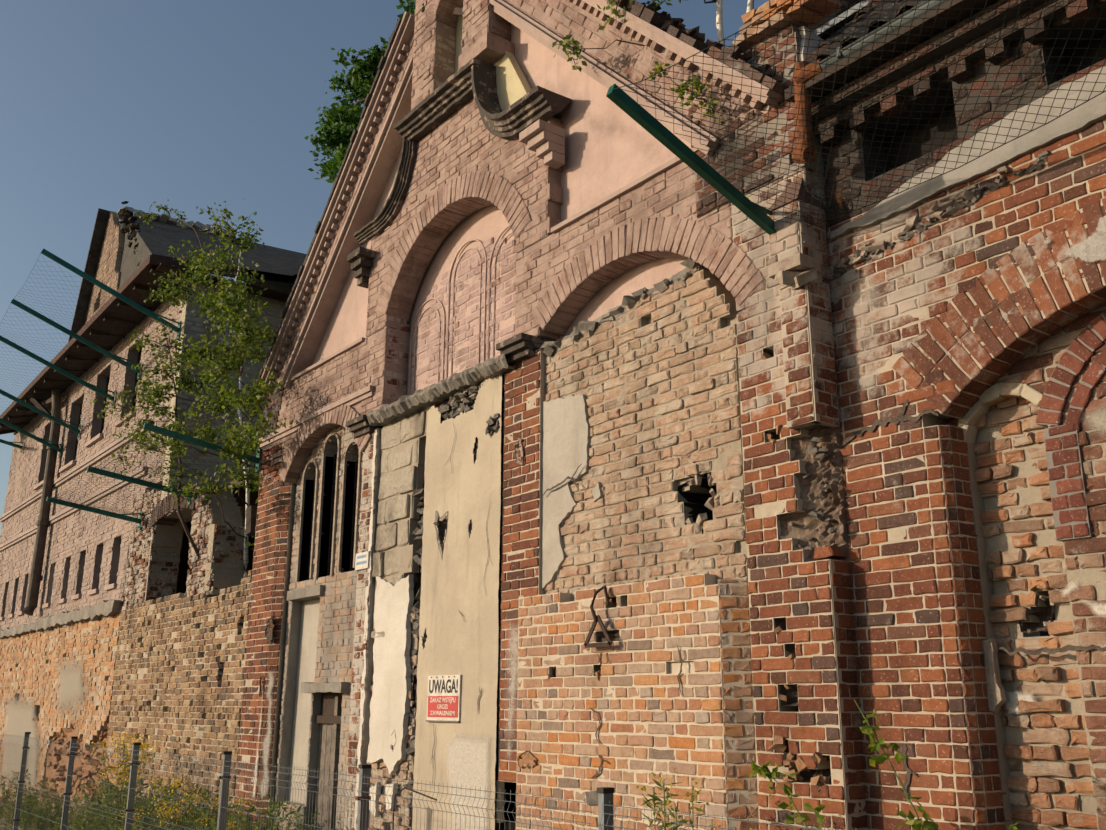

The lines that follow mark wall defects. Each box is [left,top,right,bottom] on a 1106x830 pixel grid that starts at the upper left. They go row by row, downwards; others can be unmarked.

spalling [832,150,1051,278]
peeling [1065,216,1106,262]
spalling [438,384,483,420]
spalling [433,510,448,558]
peeling [541,394,591,590]
spalling [685,474,716,525]
spalling [766,421,849,562]
peeling [367,574,427,817]